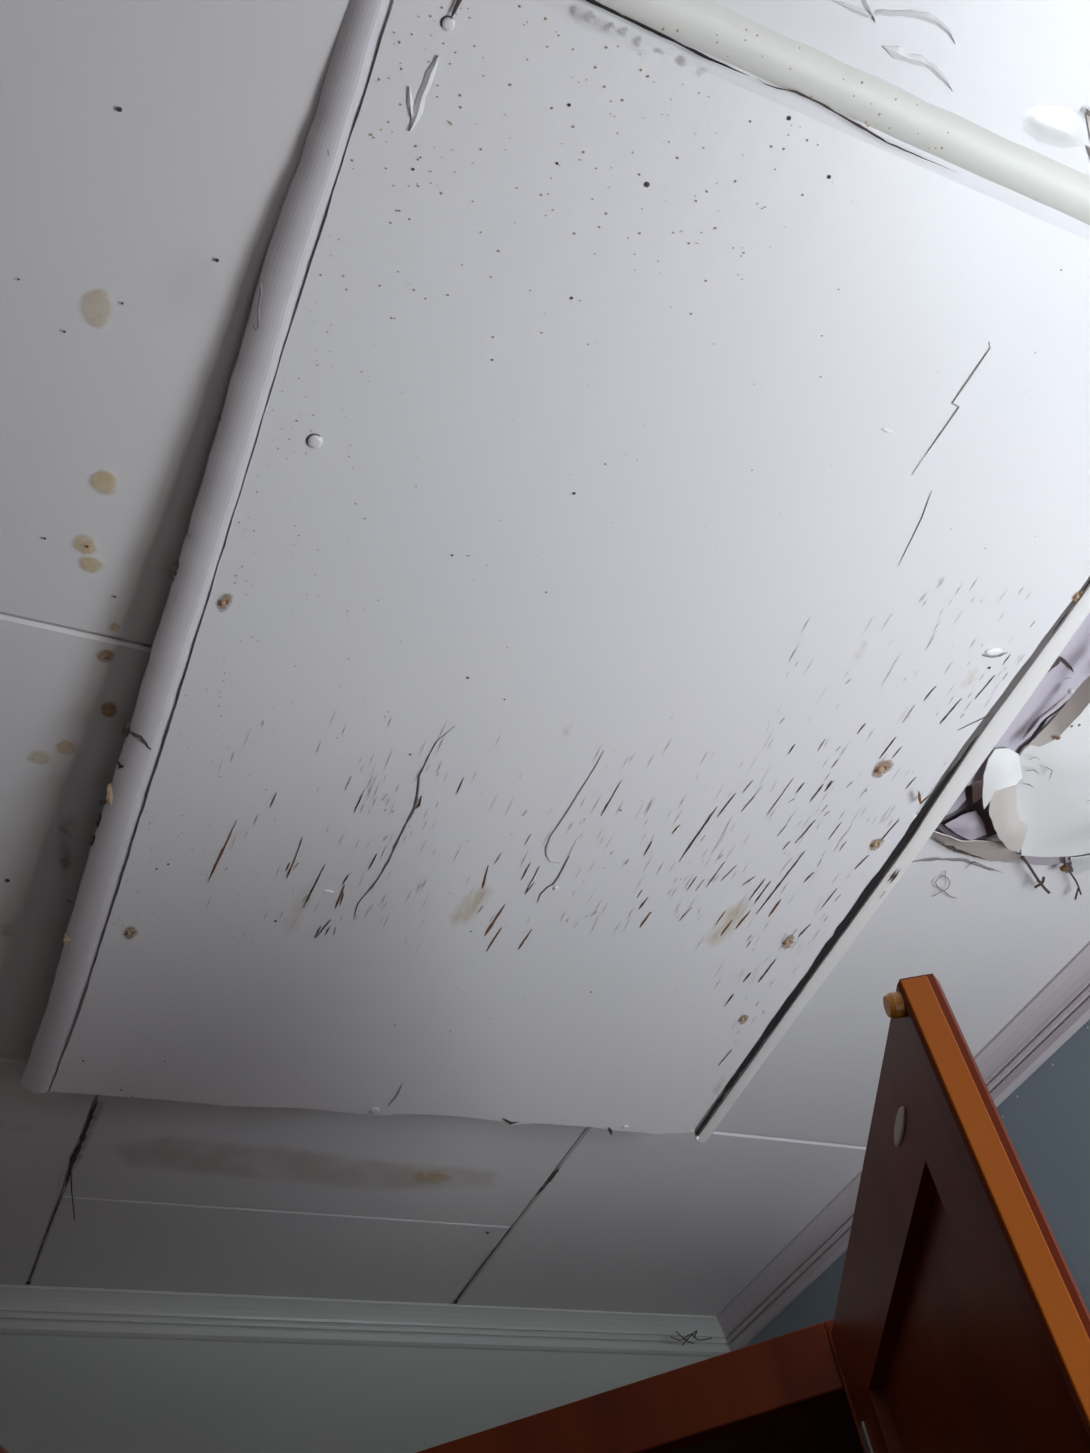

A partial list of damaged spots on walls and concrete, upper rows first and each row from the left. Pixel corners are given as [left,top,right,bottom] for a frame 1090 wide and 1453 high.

crack [586,0,960,174]
crack [898,342,991,566]
peeling [967,613,1090,875]
crack [207,793,277,907]
crack [242,576,1090,1135]
crack [28,1099,98,1283]
crack [536,1167,560,1196]